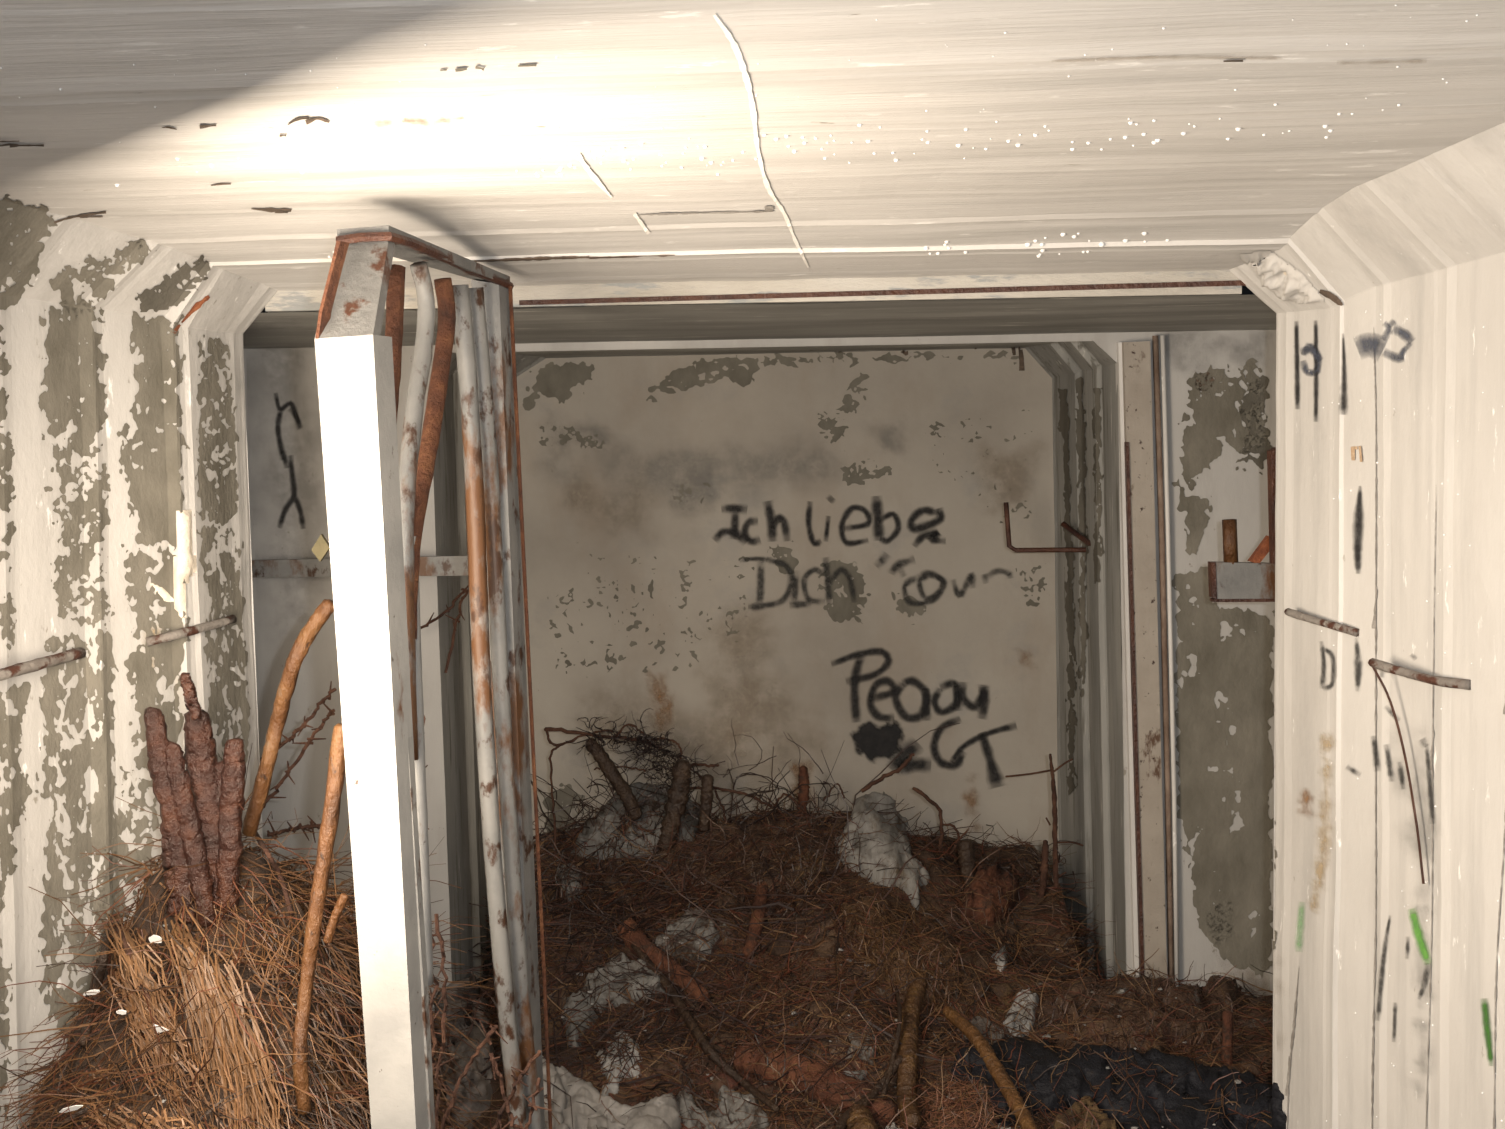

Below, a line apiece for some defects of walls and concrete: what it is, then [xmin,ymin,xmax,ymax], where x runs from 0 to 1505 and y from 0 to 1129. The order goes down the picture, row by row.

crack [472,14,809,268]
corrosion [315,241,349,339]
peeling [523,361,595,411]
peeling [539,426,606,449]
peeling [646,348,1019,444]
peeling [840,461,892,486]
peeling [0,195,251,1041]
peeling [547,554,754,676]
peeling [767,540,799,574]
peeling [817,560,871,624]
peeling [1172,358,1360,977]
peeling [0,938,13,1120]